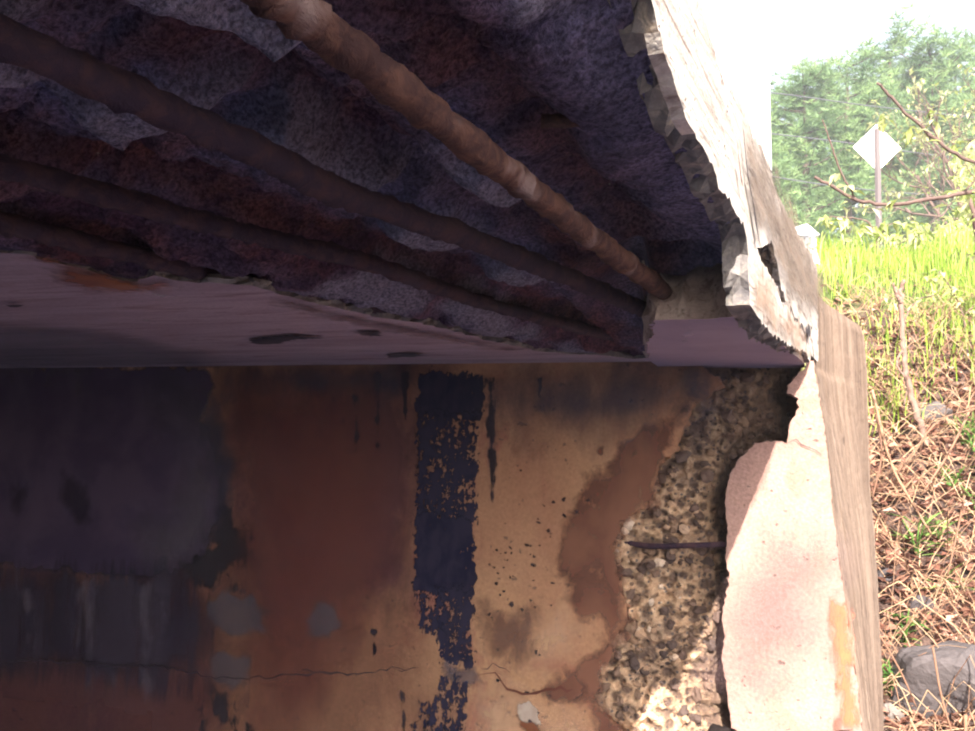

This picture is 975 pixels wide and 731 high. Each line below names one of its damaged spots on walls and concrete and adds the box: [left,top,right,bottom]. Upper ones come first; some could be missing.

spalling [323,0,730,276]
spalling [0,0,648,357]
damp [518,363,662,418]
damp [0,406,253,694]
spalling [596,367,801,731]
crack [0,658,419,680]
crack [475,663,573,698]
damp [199,688,252,731]
spalling [517,692,541,731]